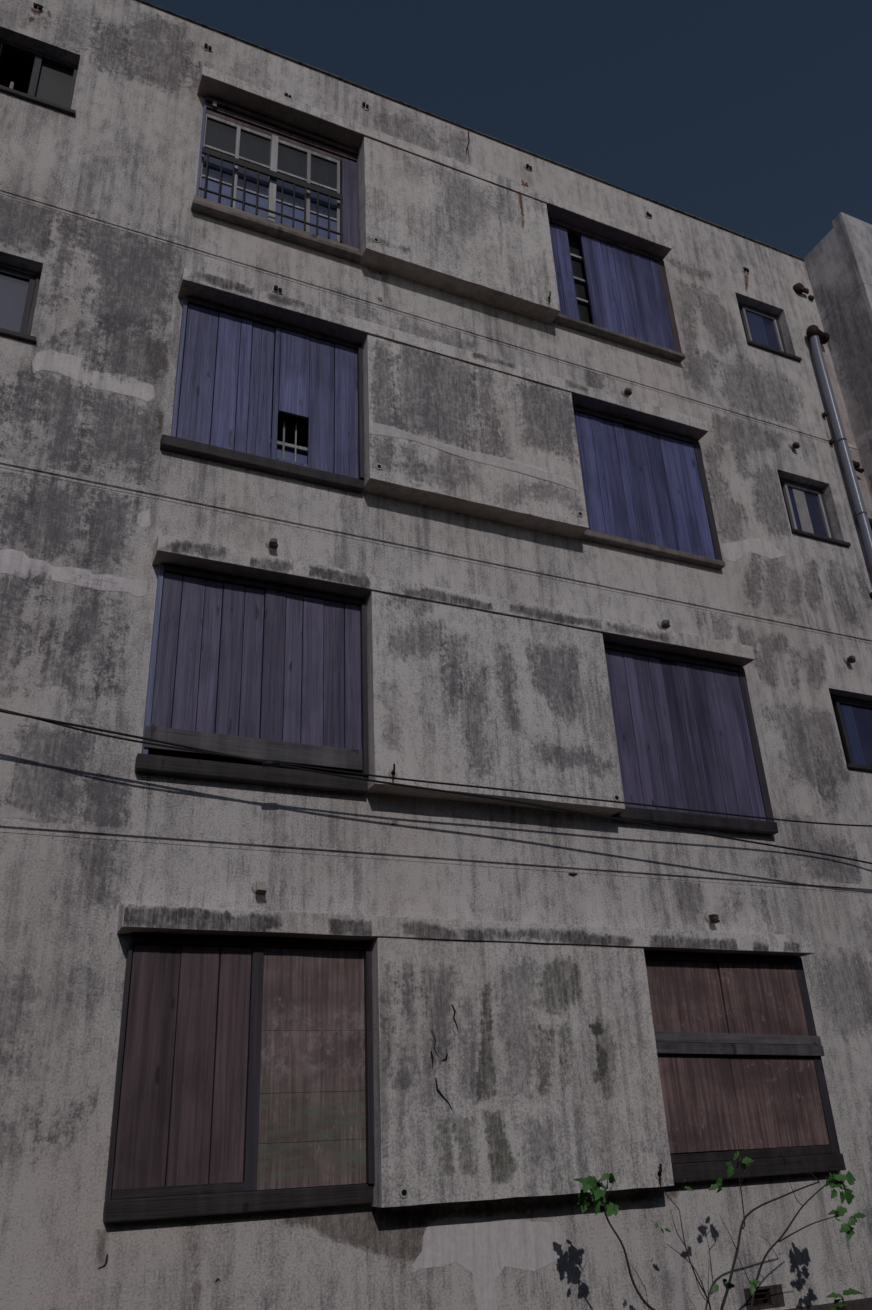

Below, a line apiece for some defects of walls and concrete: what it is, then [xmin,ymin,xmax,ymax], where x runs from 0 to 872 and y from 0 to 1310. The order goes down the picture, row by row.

damp [57,15,200,93]
damp [371,329,604,486]
damp [745,554,871,627]
damp [380,967,475,1089]
crack [431,1004,458,1111]
damp [485,1111,516,1181]
damp [283,1200,576,1260]